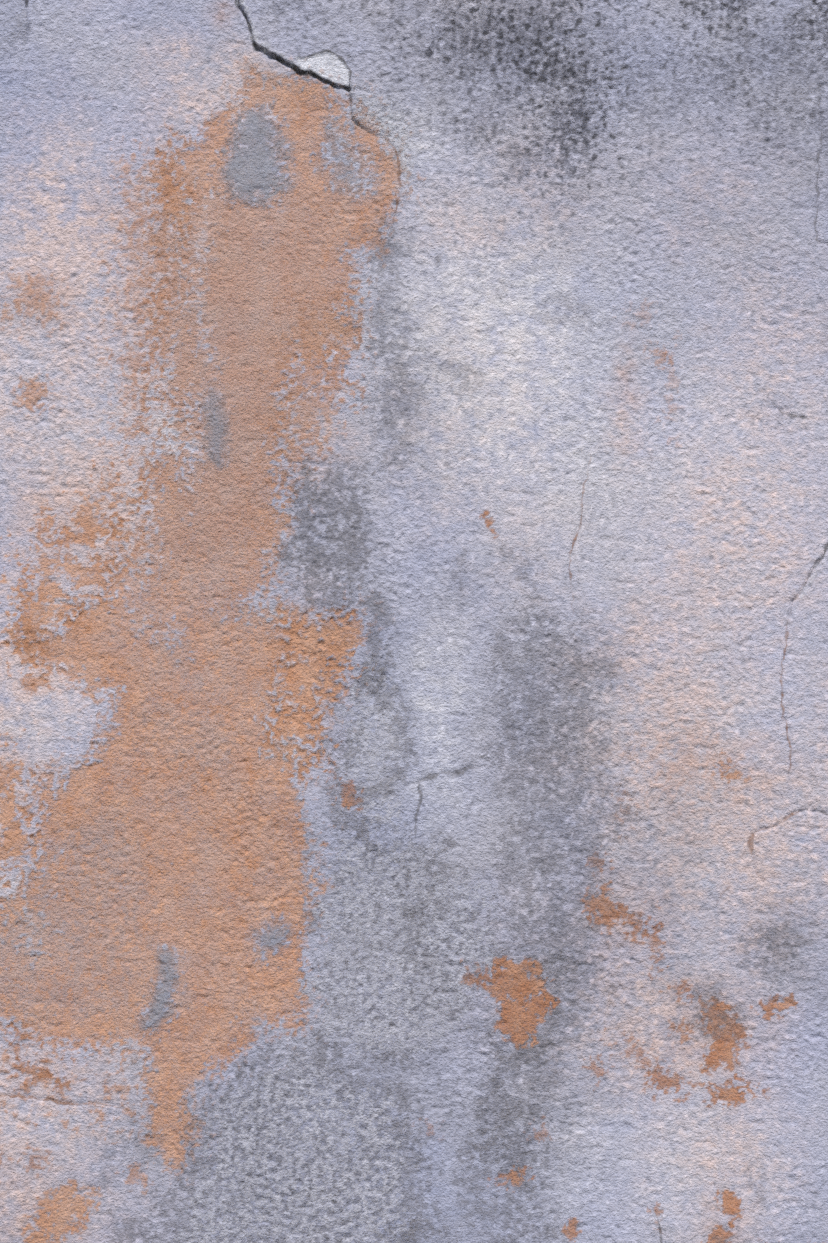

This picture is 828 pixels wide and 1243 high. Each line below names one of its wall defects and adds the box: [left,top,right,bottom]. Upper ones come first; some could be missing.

crack [236,1,351,89]
peeling [0,51,411,1168]
peeling [465,956,560,1048]
peeling [646,981,765,1107]
peeling [751,993,798,1020]
peeling [23,1180,100,1243]